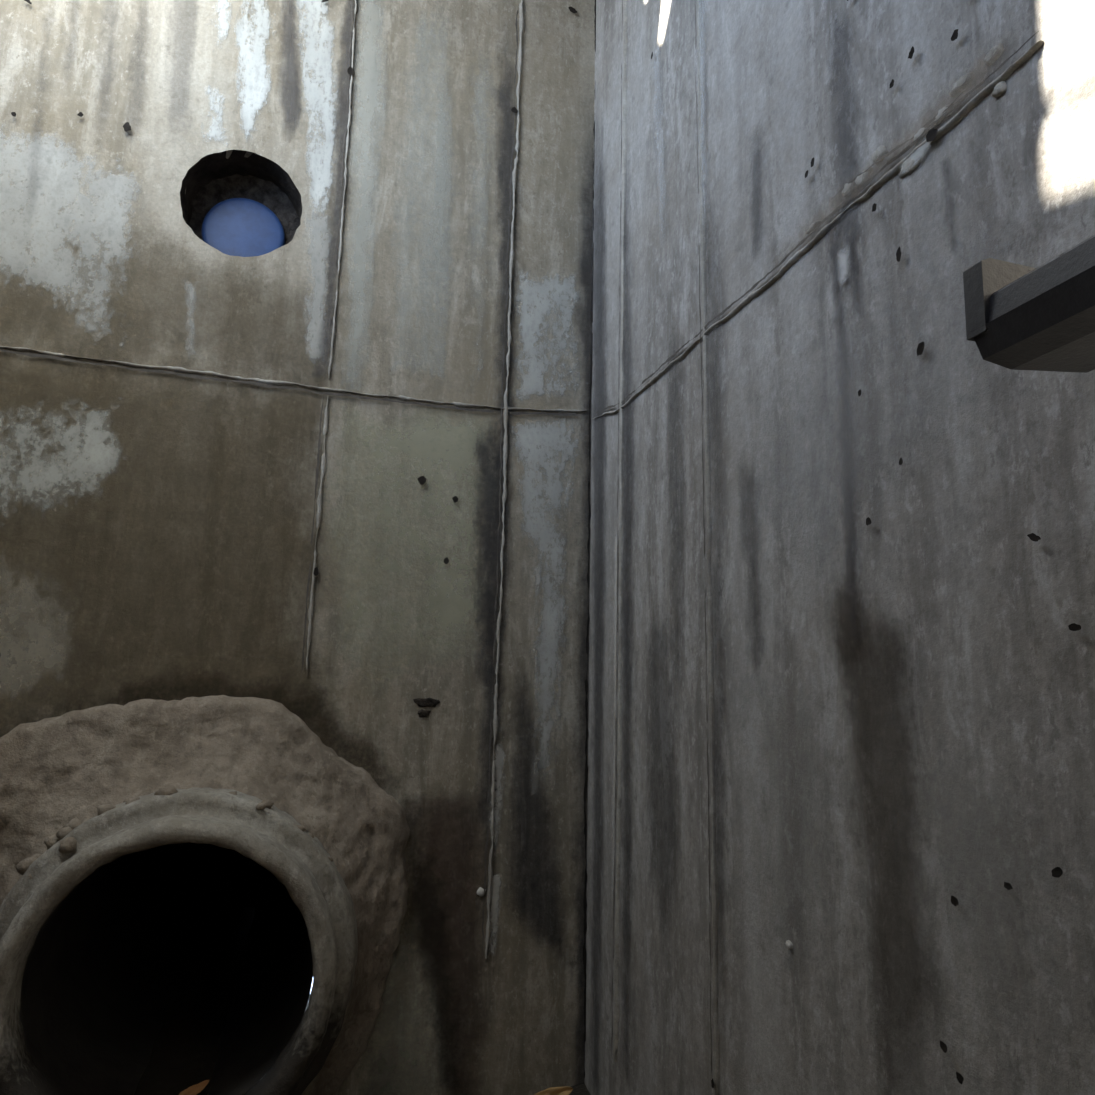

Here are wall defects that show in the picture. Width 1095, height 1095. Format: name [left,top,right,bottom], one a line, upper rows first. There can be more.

water stain [203,87,225,141]
water stain [217,0,270,136]
water stain [283,0,385,379]
water stain [343,74,631,1095]
water stain [831,248,925,1030]